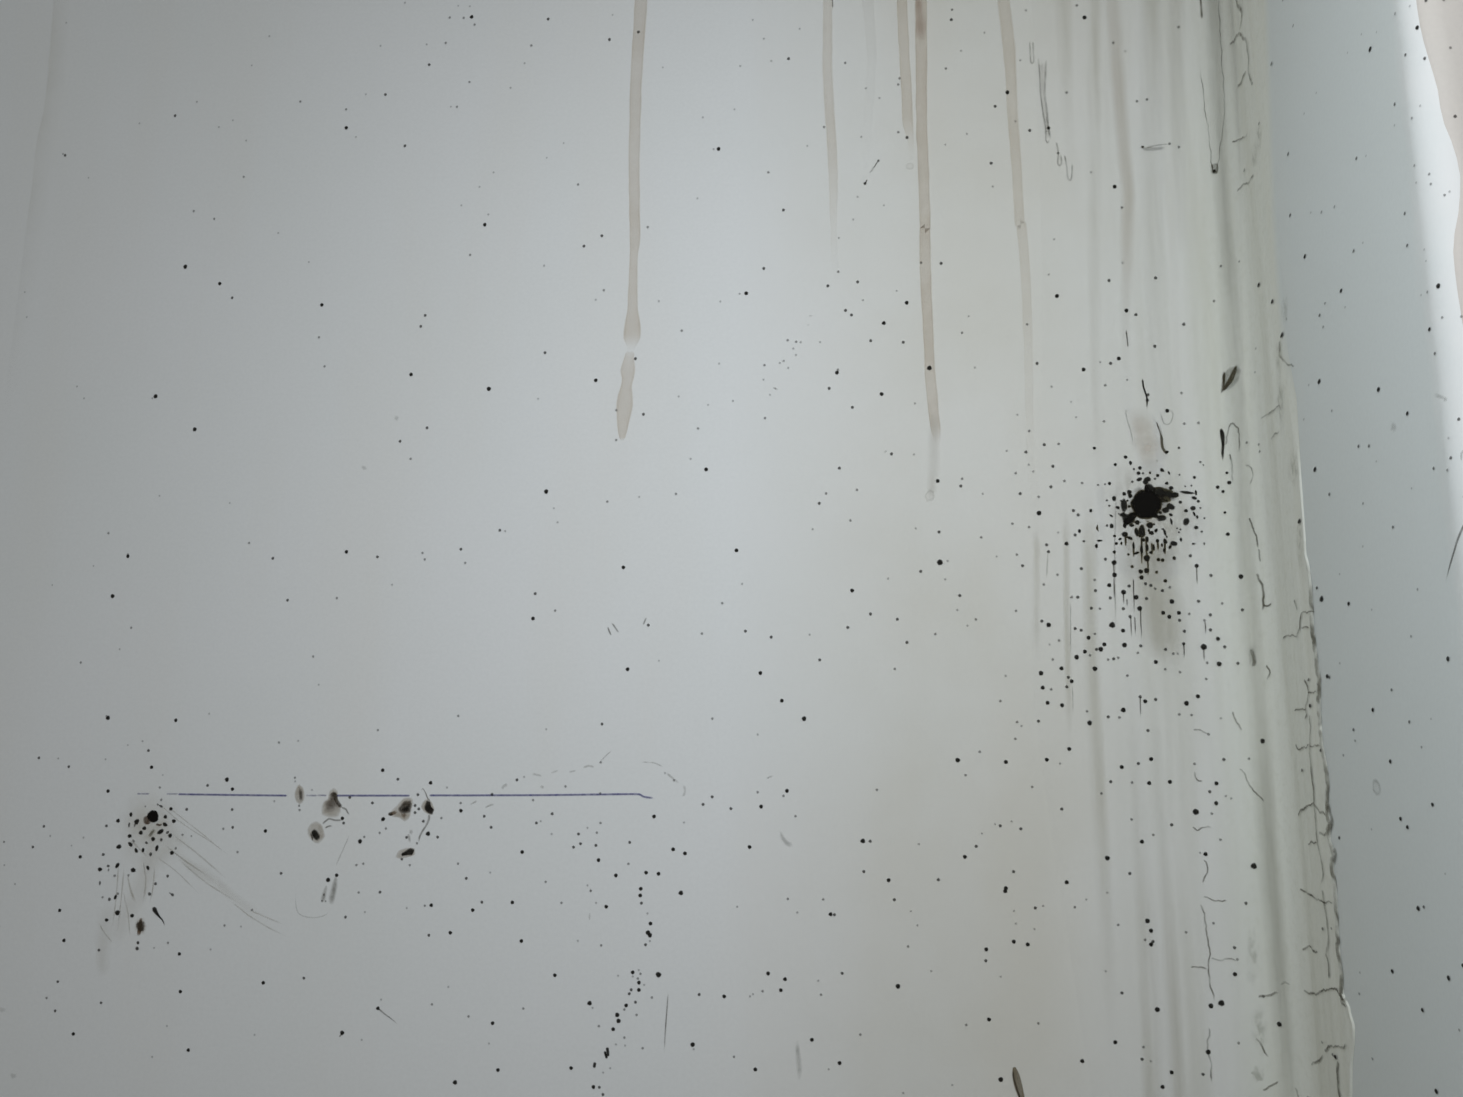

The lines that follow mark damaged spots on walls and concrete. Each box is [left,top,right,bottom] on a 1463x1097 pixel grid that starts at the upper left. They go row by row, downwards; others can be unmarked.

damp [1037,447,1239,722]
peeling [1161,0,1355,1097]
crack [1252,580,1345,1006]
crack [1314,1045,1345,1097]